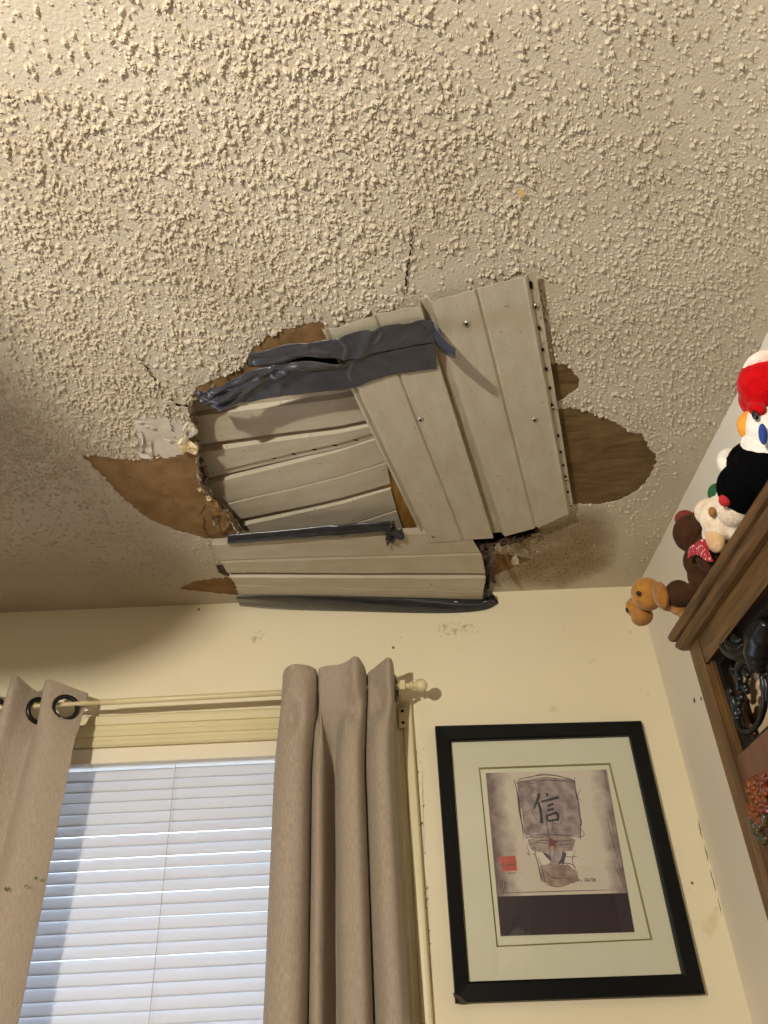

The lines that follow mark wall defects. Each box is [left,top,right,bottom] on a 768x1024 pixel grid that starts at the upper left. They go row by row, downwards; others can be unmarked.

crack [401,223,415,307]
peeling [83,322,327,539]
peeling [551,363,657,506]
peeling [179,565,238,595]
peeling [492,553,531,576]